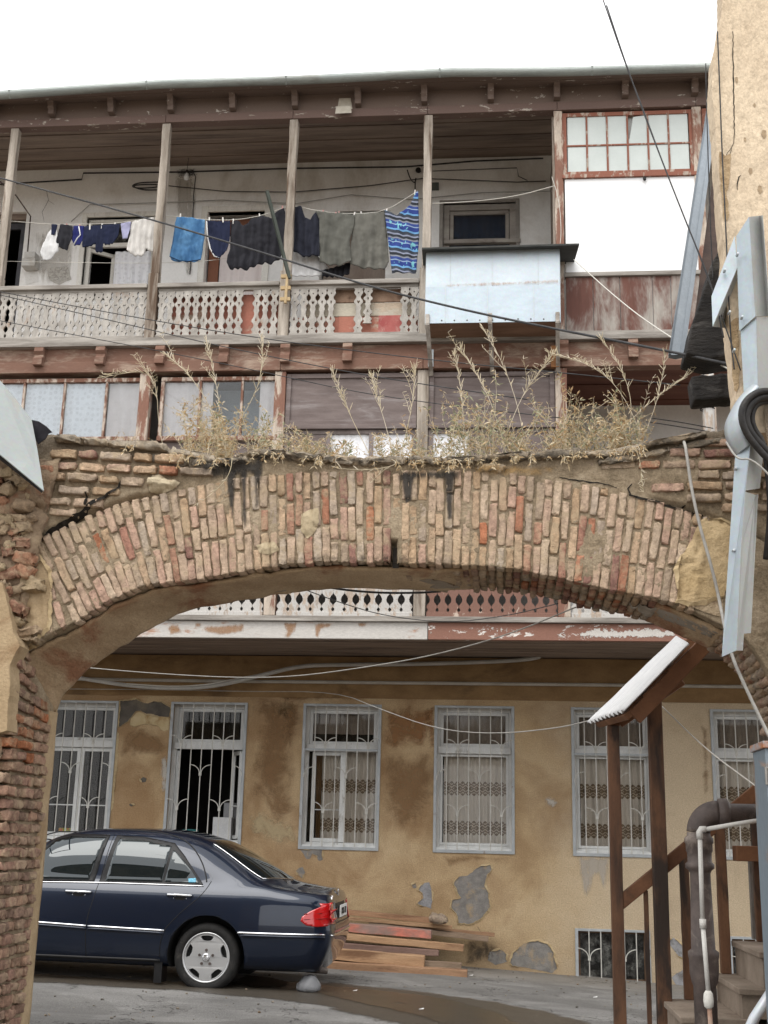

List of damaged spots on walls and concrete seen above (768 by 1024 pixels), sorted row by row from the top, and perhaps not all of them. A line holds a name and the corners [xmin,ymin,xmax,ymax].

crack [42,480,121,540]
leakage [197,453,270,525]
leakage [401,458,549,518]
peeling [580,628,675,639]
flaking render [111,698,171,811]
flaking render [411,882,434,909]
flaking render [450,863,493,926]
flaking render [488,939,558,973]